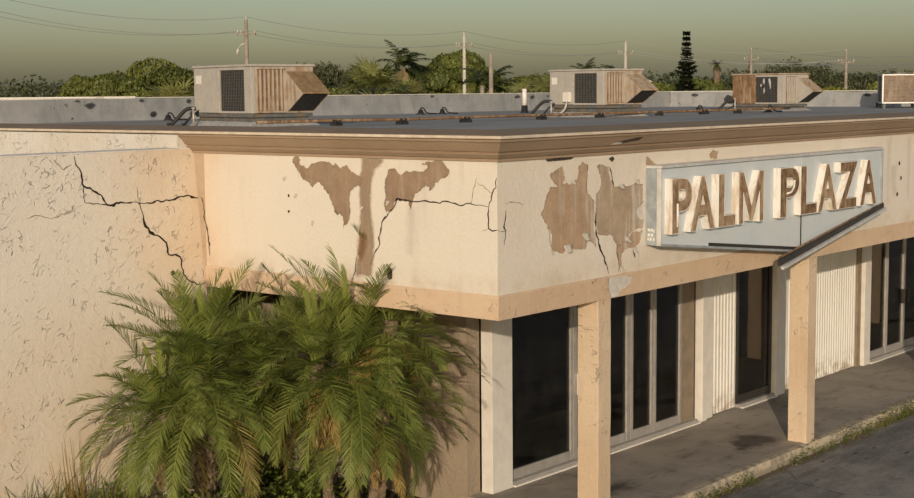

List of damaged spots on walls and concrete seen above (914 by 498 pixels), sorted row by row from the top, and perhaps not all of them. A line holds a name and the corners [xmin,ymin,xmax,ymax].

crack [30,156,210,289]
peeling [293,156,363,227]
peeling [384,160,449,212]
crack [352,178,522,279]
peeling [541,156,645,297]
crack [595,214,635,273]